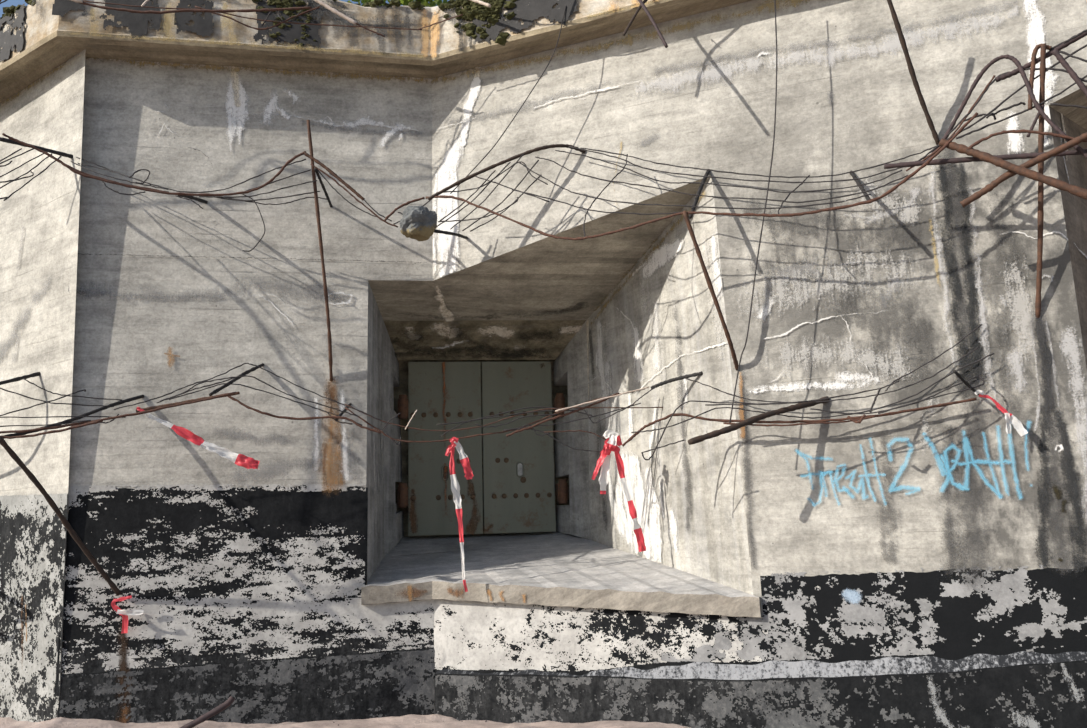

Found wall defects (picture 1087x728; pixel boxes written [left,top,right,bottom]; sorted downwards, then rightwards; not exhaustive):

water stain [72,2,190,42]
water stain [206,0,424,58]
water stain [444,8,473,52]
water stain [637,0,1070,184]
water stain [392,67,692,563]
water stain [704,235,724,359]
water stain [738,148,1087,582]
rust [312,379,351,491]
peeling [0,484,1087,728]